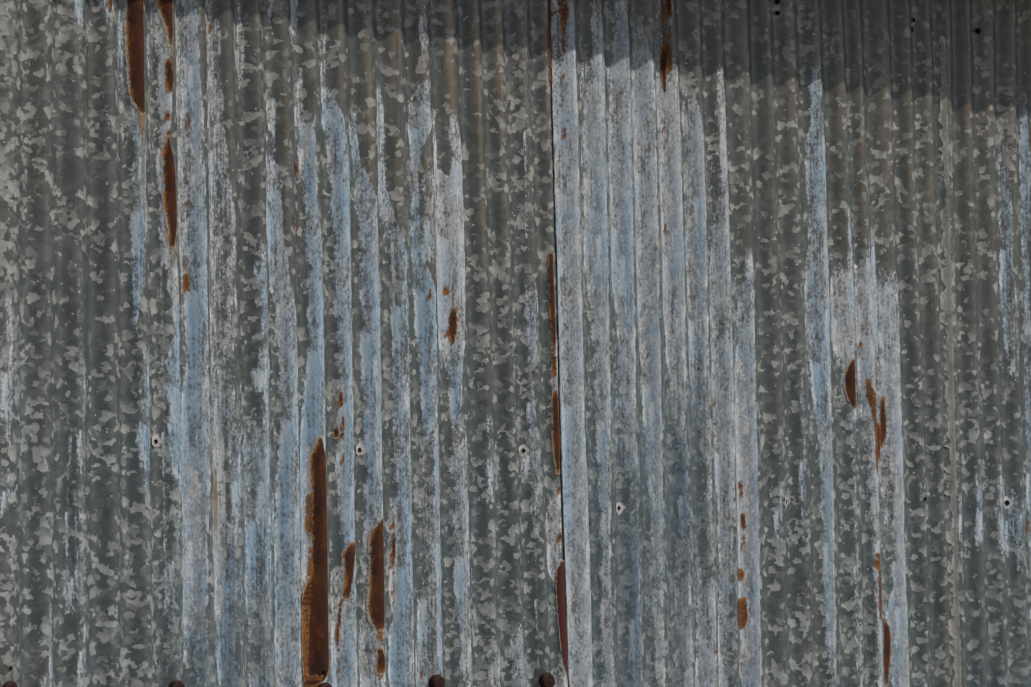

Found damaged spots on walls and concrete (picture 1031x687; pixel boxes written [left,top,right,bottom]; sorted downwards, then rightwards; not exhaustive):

corrosion [108,0,174,131]
corrosion [660,0,673,92]
corrosion [160,110,191,293]
corrosion [445,307,458,345]
corrosion [548,252,561,494]
corrosion [844,341,887,474]
corrosion [302,392,355,687]
corrosion [366,517,396,680]
corrosion [556,560,568,676]